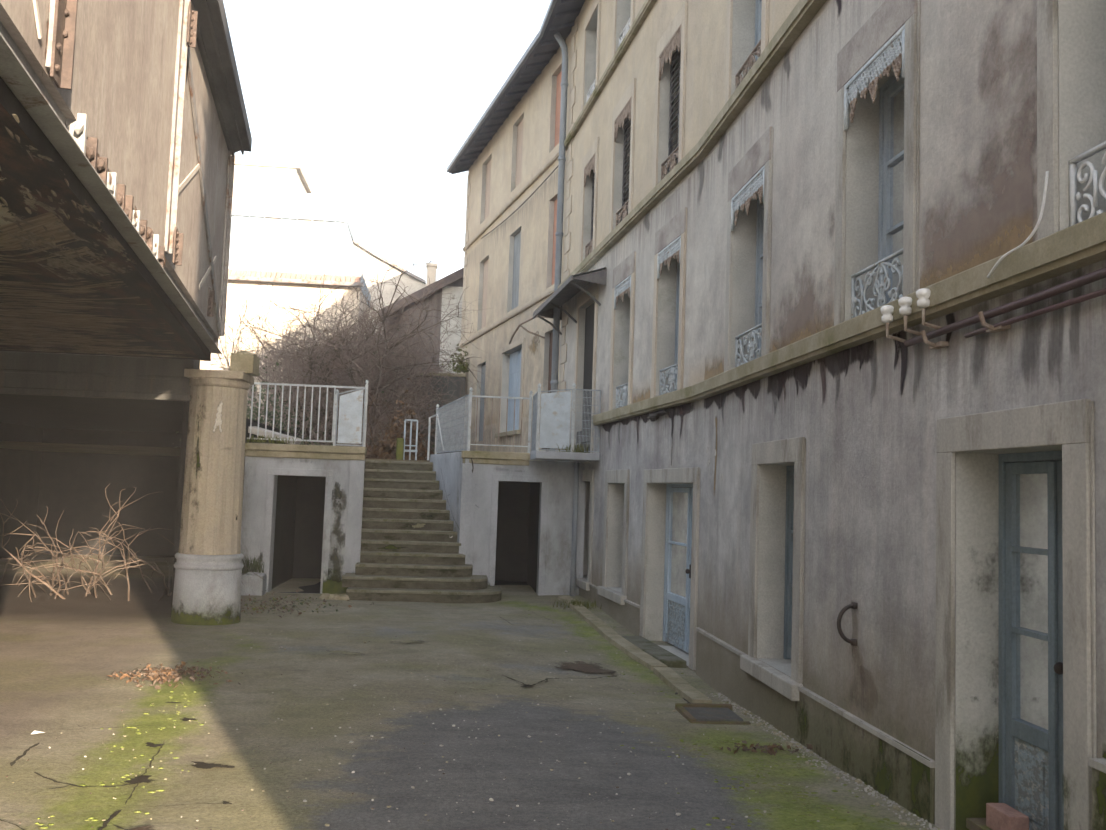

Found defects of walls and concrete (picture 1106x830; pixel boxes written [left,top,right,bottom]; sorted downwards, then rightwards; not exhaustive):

peeling [5,114,69,186]
leakage [920,92,1037,289]
peeling [0,184,193,358]
leakage [603,340,874,491]
leakage [892,330,908,395]
leakage [946,313,955,344]
crack [10,724,221,830]